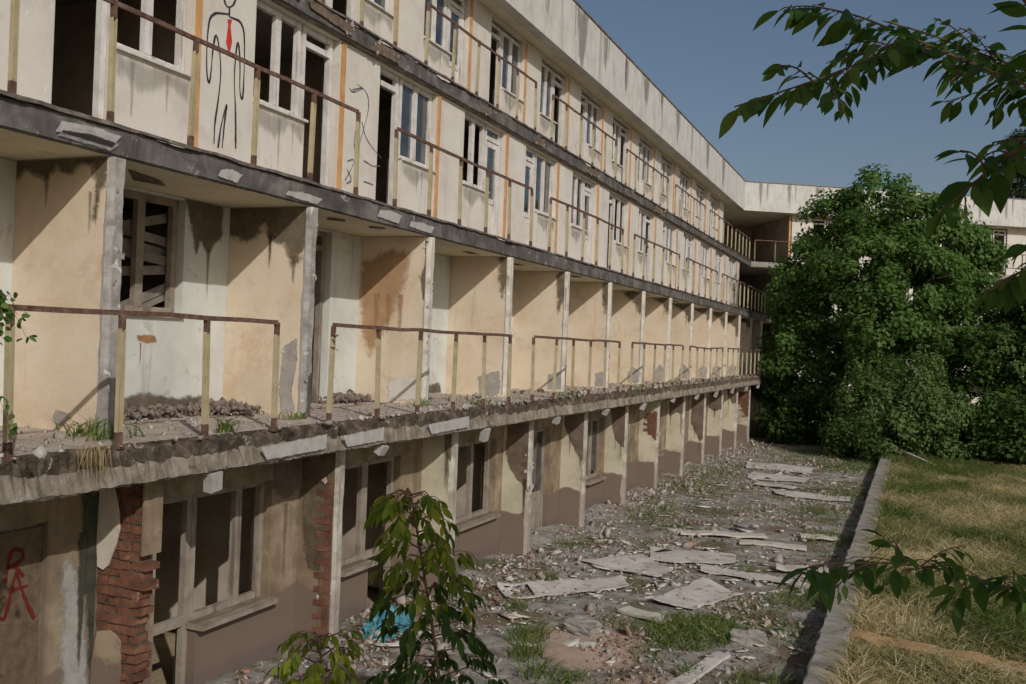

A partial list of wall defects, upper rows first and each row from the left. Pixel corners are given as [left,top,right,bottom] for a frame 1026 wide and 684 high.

damp [16,157,108,219]
damp [186,199,307,270]
damp [361,250,409,348]
rust [138,335,156,360]
peeling [53,410,73,426]
peeling [261,434,327,459]
damp [59,491,99,684]
flaking render [90,481,164,684]